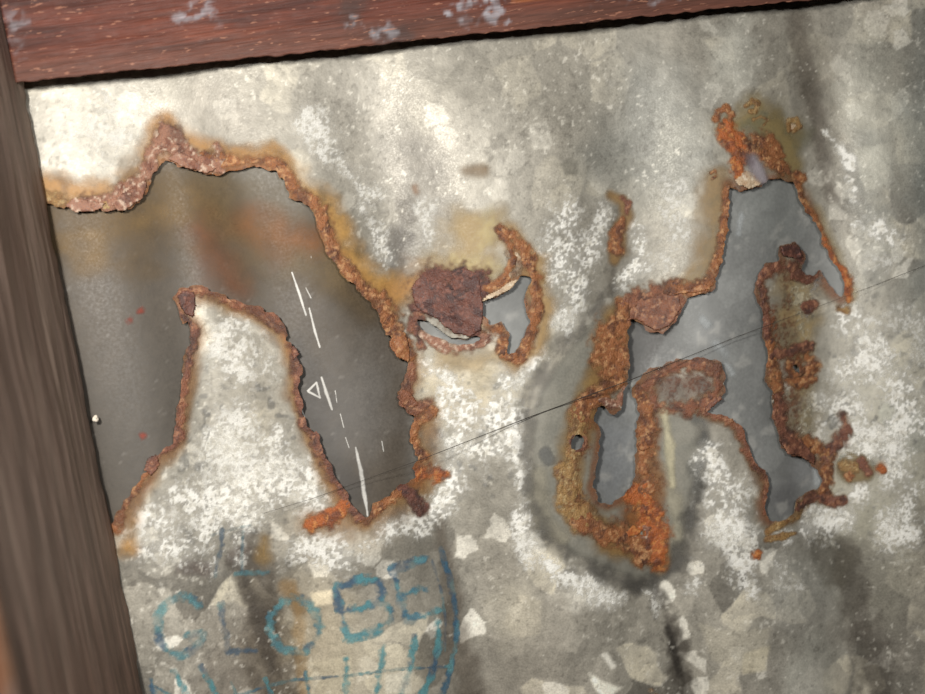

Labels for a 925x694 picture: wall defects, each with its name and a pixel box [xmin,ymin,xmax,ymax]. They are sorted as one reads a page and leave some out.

rust [42,98,925,609]